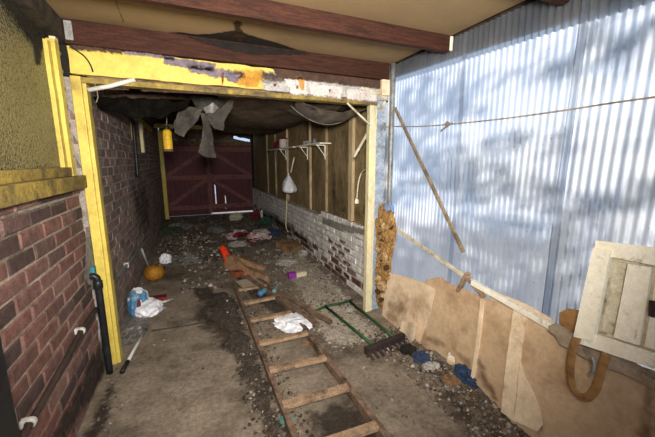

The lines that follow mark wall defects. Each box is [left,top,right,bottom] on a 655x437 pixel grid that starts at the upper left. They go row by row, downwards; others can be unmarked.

damp [170,21,306,56]
peeling [70,45,390,102]